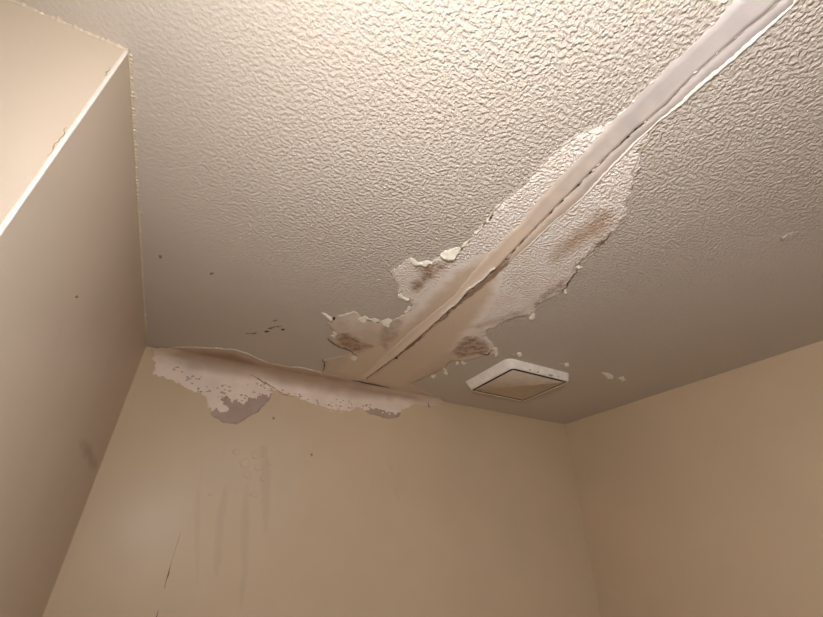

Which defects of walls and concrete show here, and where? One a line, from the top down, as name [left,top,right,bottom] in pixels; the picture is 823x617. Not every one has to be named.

peeling [150,109,664,424]
crack [367,0,780,379]